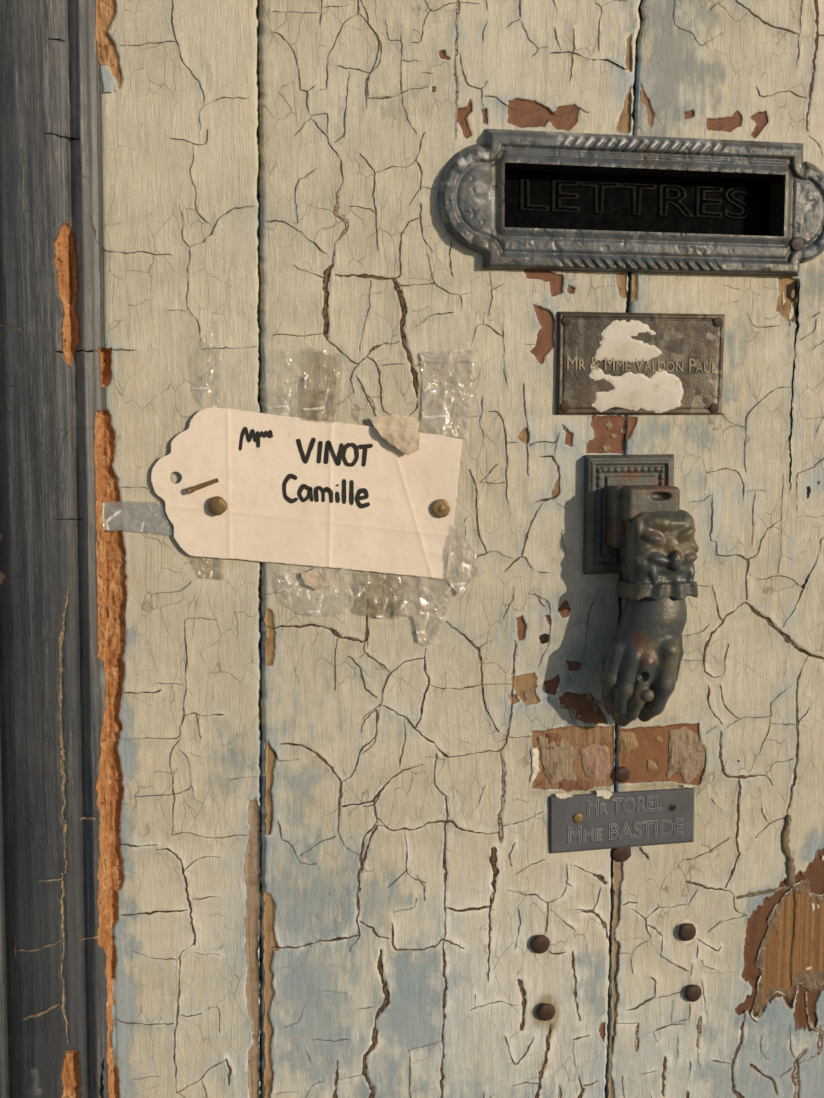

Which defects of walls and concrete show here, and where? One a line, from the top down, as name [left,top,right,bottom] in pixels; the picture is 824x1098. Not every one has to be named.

crack [673,0,824,157]
peeling [457,99,488,138]
peeling [508,98,580,131]
peeling [706,110,769,138]
peeling [524,270,575,297]
crack [92,0,627,665]
peeling [530,304,555,364]
peeling [587,415,638,454]
crack [266,278,824,1098]
peeling [508,660,608,724]
crack [117,617,250,1098]
peeling [735,815,824,1055]